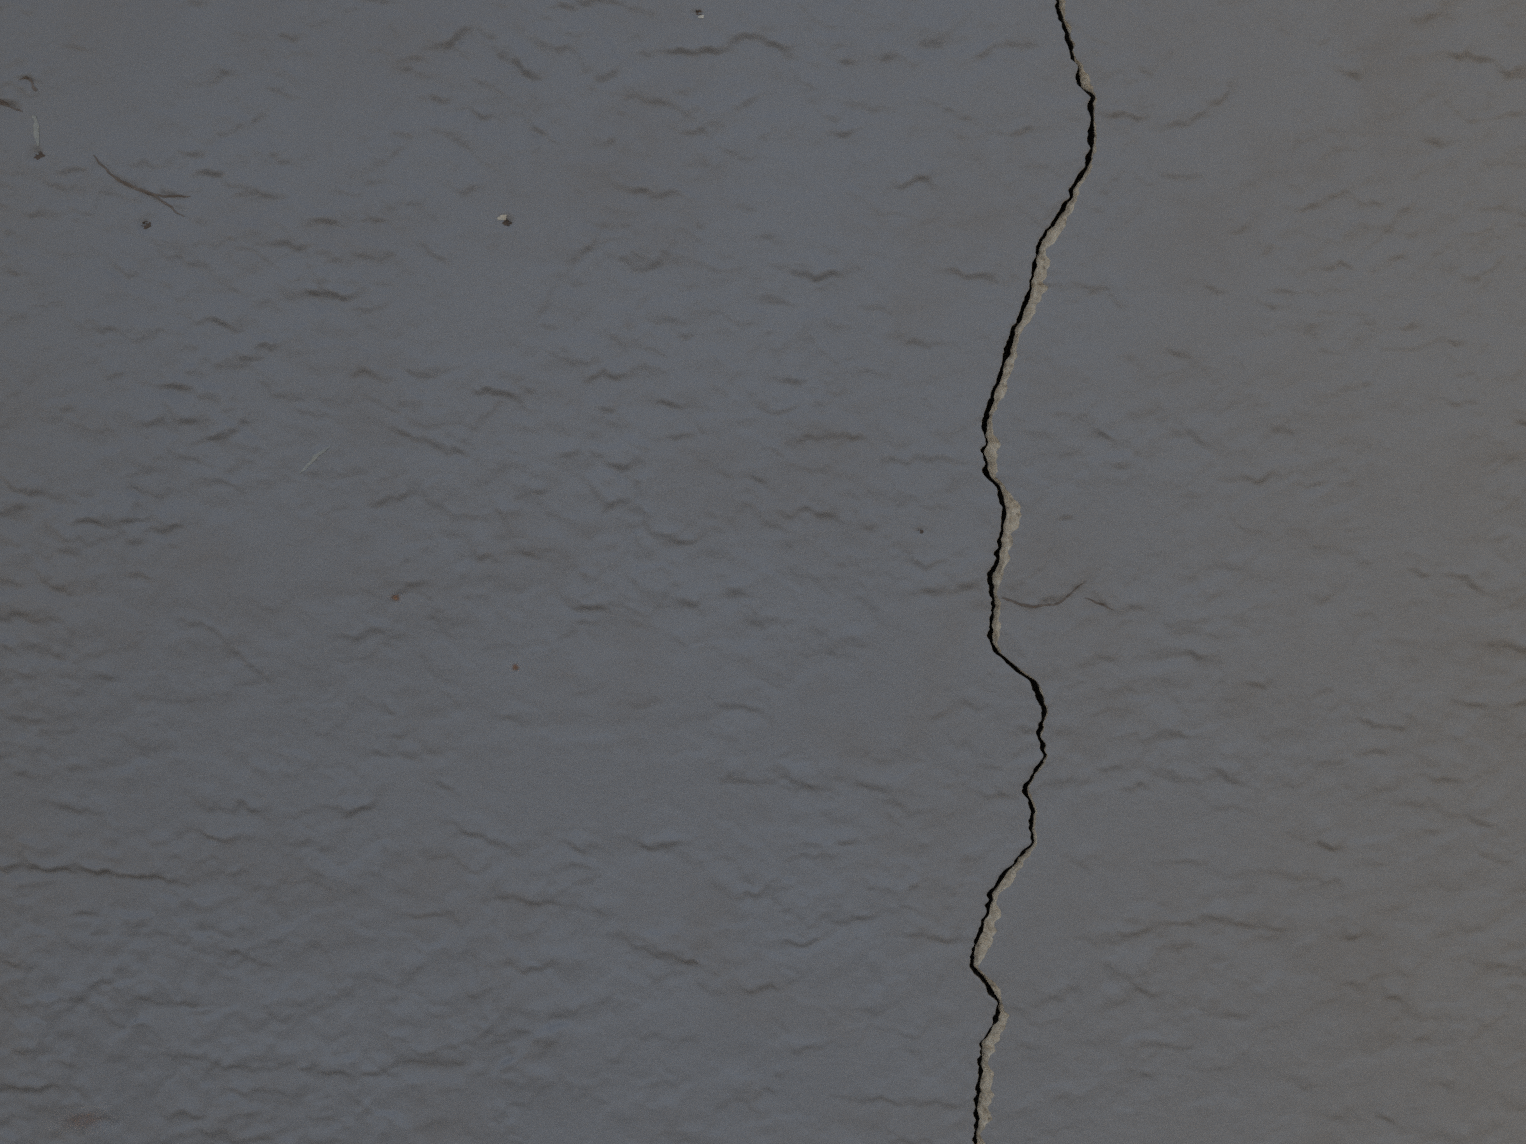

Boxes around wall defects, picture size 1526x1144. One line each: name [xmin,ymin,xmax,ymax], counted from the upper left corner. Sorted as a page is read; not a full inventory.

crack [969,0,1113,1144]